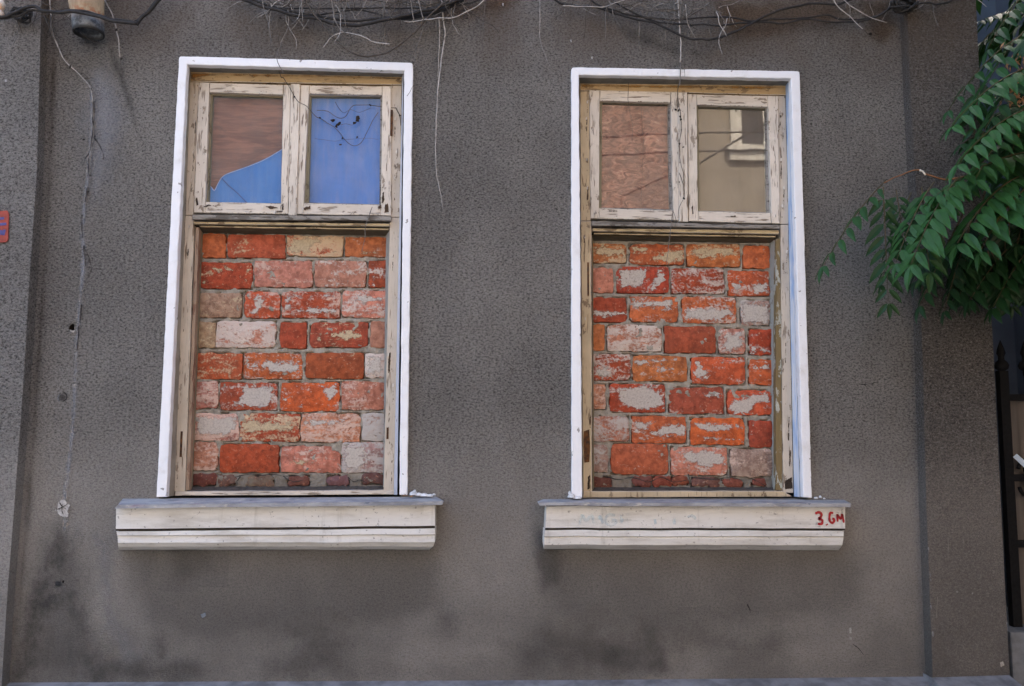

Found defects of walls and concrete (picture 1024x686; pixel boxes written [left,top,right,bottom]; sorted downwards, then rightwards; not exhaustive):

crack [57,89,104,500]
peeling [785,417,793,489]